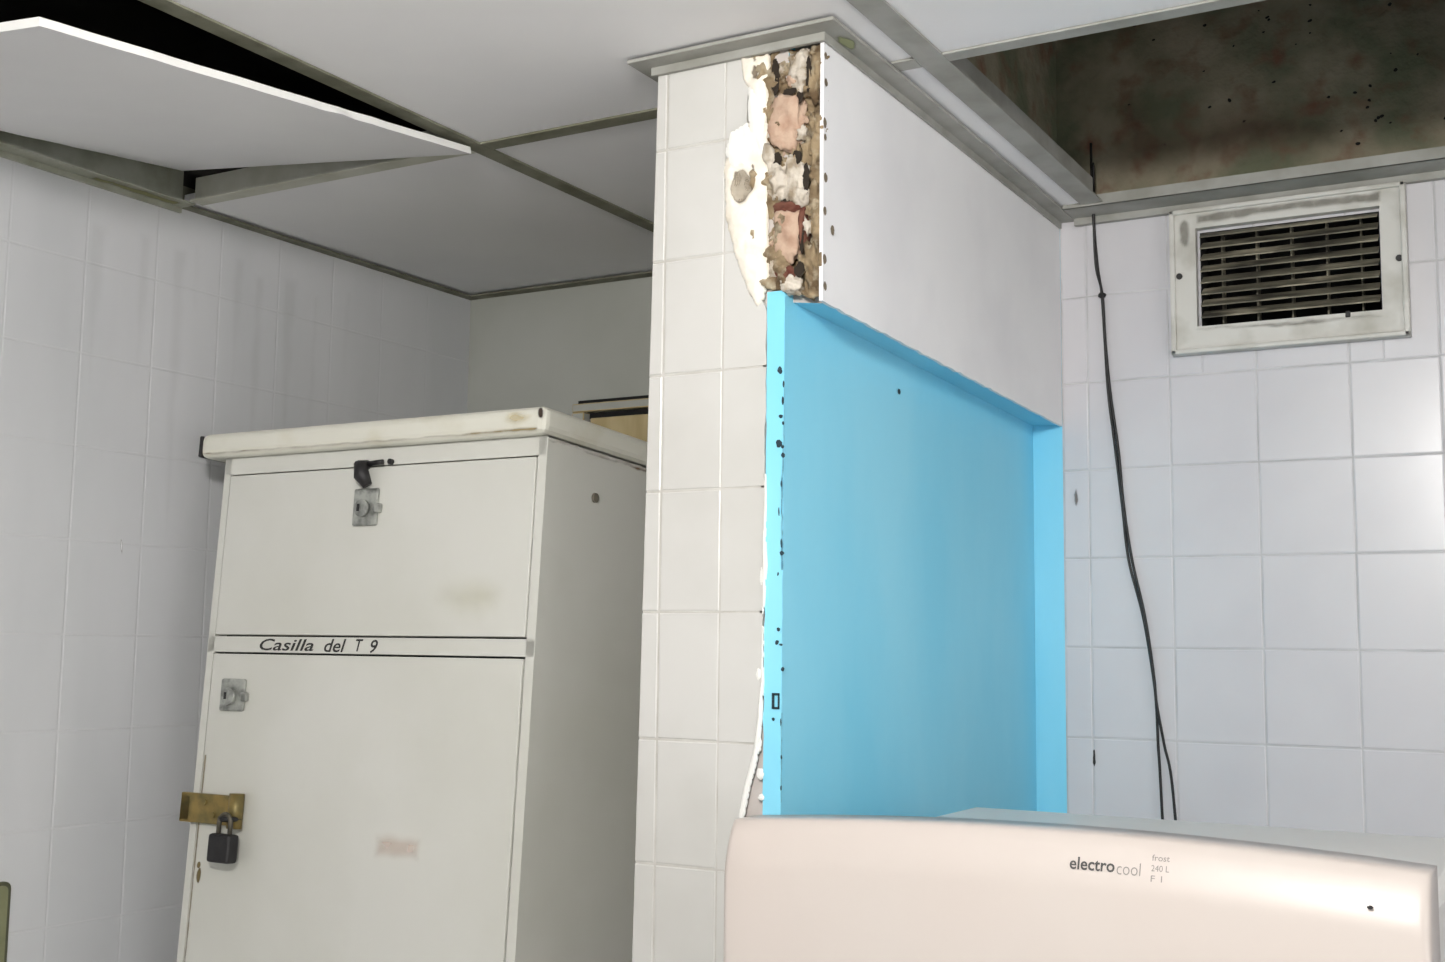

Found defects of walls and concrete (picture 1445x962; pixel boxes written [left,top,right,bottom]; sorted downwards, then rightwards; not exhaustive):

spalling [724,43,834,306]